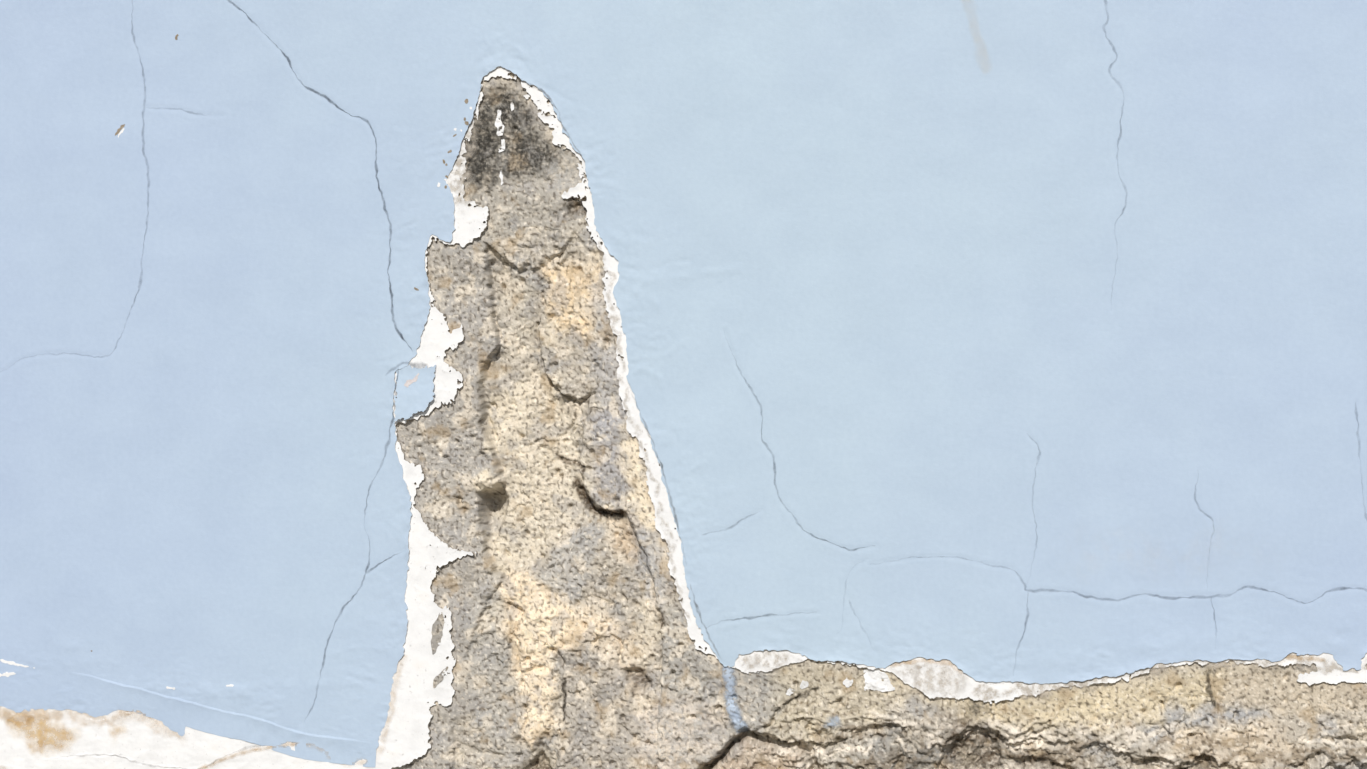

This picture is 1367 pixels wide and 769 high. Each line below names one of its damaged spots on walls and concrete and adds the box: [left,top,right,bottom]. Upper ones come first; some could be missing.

peeling [0,706,434,769]
spalling [389,66,1367,769]